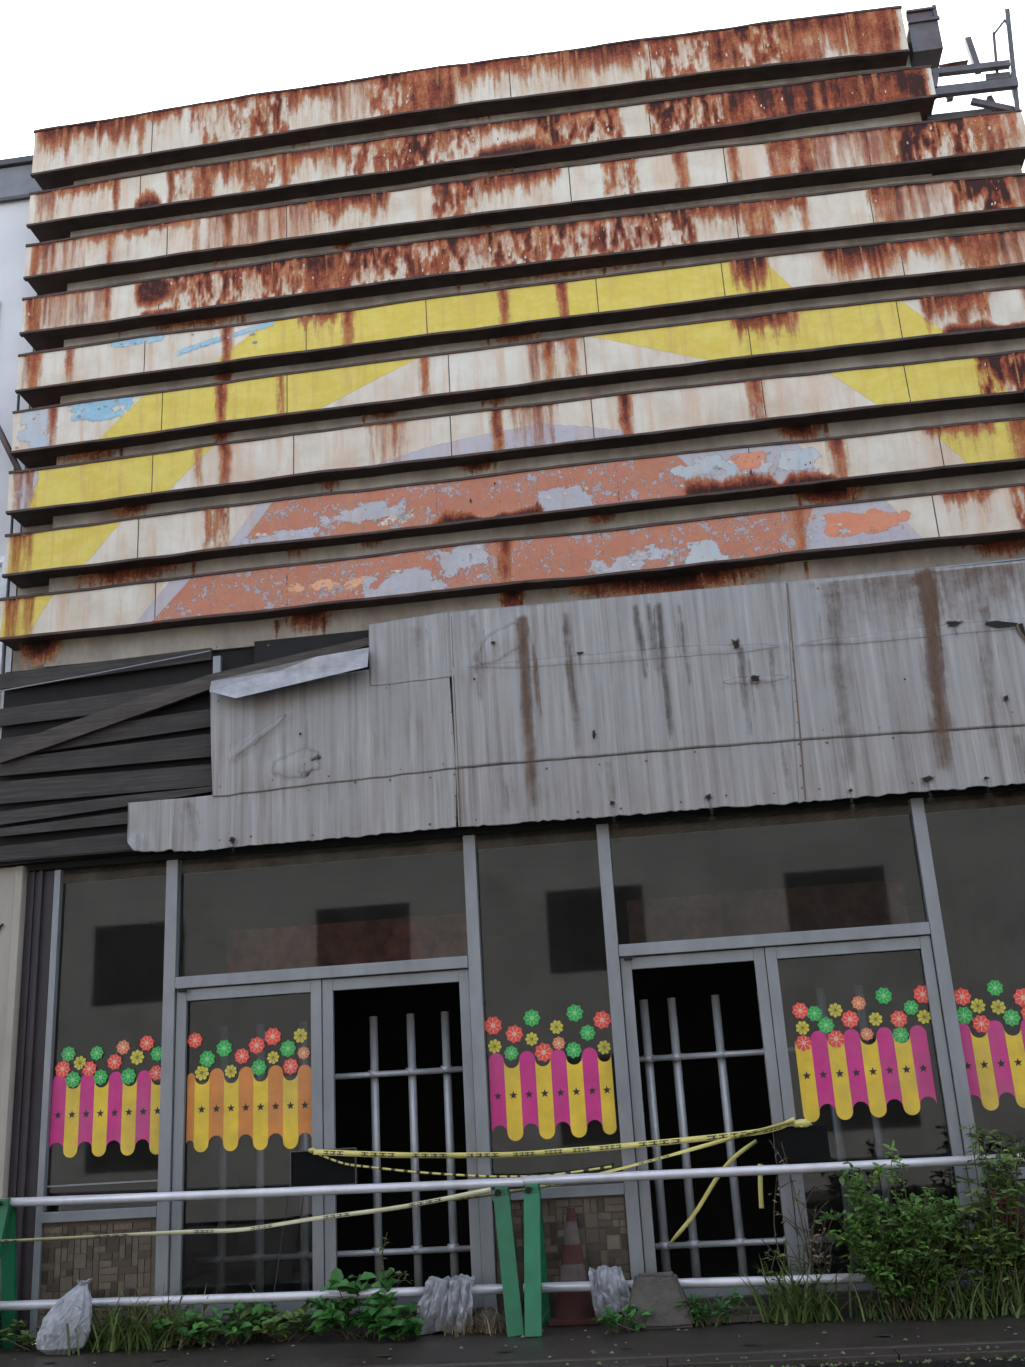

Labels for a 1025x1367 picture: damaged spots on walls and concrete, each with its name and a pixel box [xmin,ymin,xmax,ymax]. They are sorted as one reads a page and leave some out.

rust [36,9,930,222]
rust [765,112,1019,176]
rust [866,175,1025,222]
rust [822,230,1025,281]
rust [920,291,1025,333]
rust [25,192,809,485]
peeling [670,447,821,488]
peeling [535,485,596,511]
peeling [812,508,911,538]
peeling [584,539,731,575]